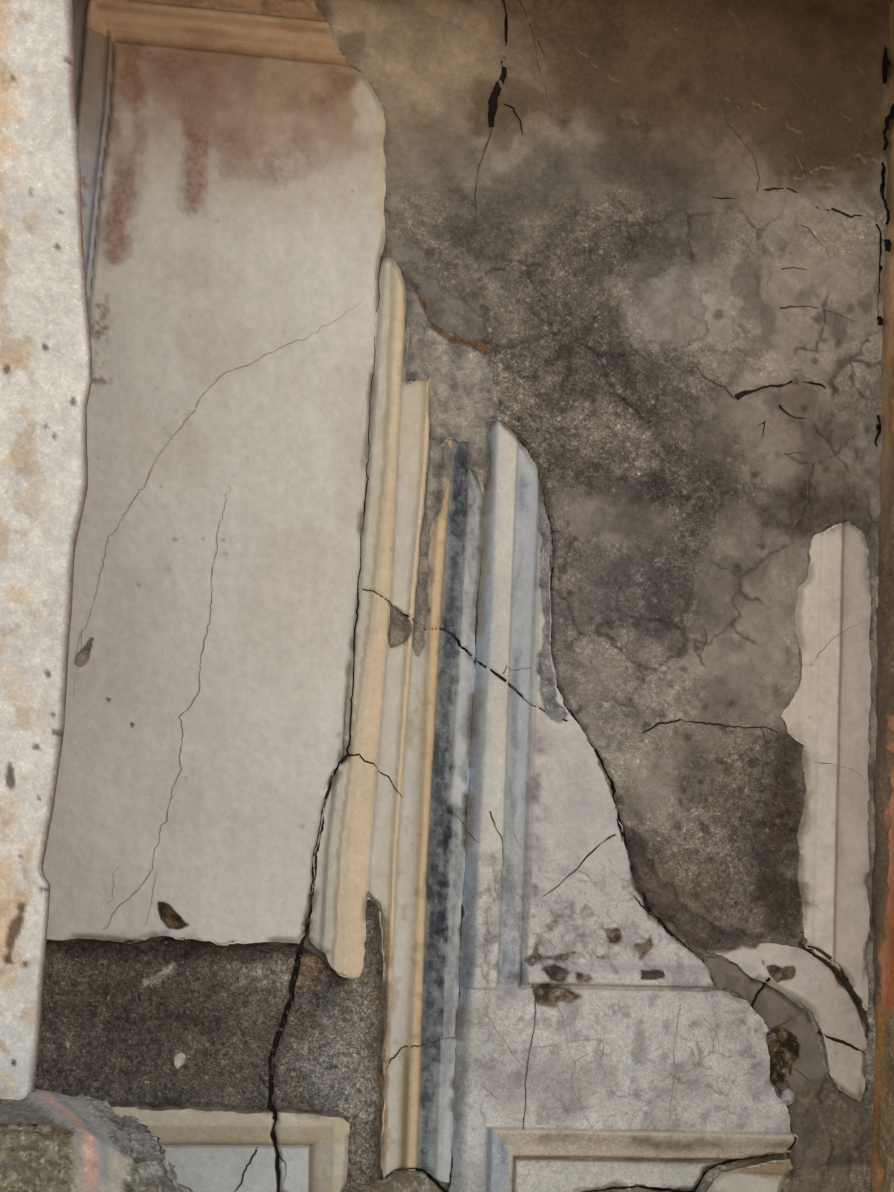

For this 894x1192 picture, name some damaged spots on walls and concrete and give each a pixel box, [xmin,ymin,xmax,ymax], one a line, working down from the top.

crack [473,0,551,227]
crack [713,45,894,326]
crack [652,348,826,455]
spalling [388,287,498,656]
crack [72,258,704,1192]
crack [642,719,778,757]
spalling [35,892,442,1192]
spalling [525,947,591,1007]
spalling [635,938,665,980]
spalling [763,962,796,982]
spalling [766,1027,800,1094]
crack [751,943,870,1055]